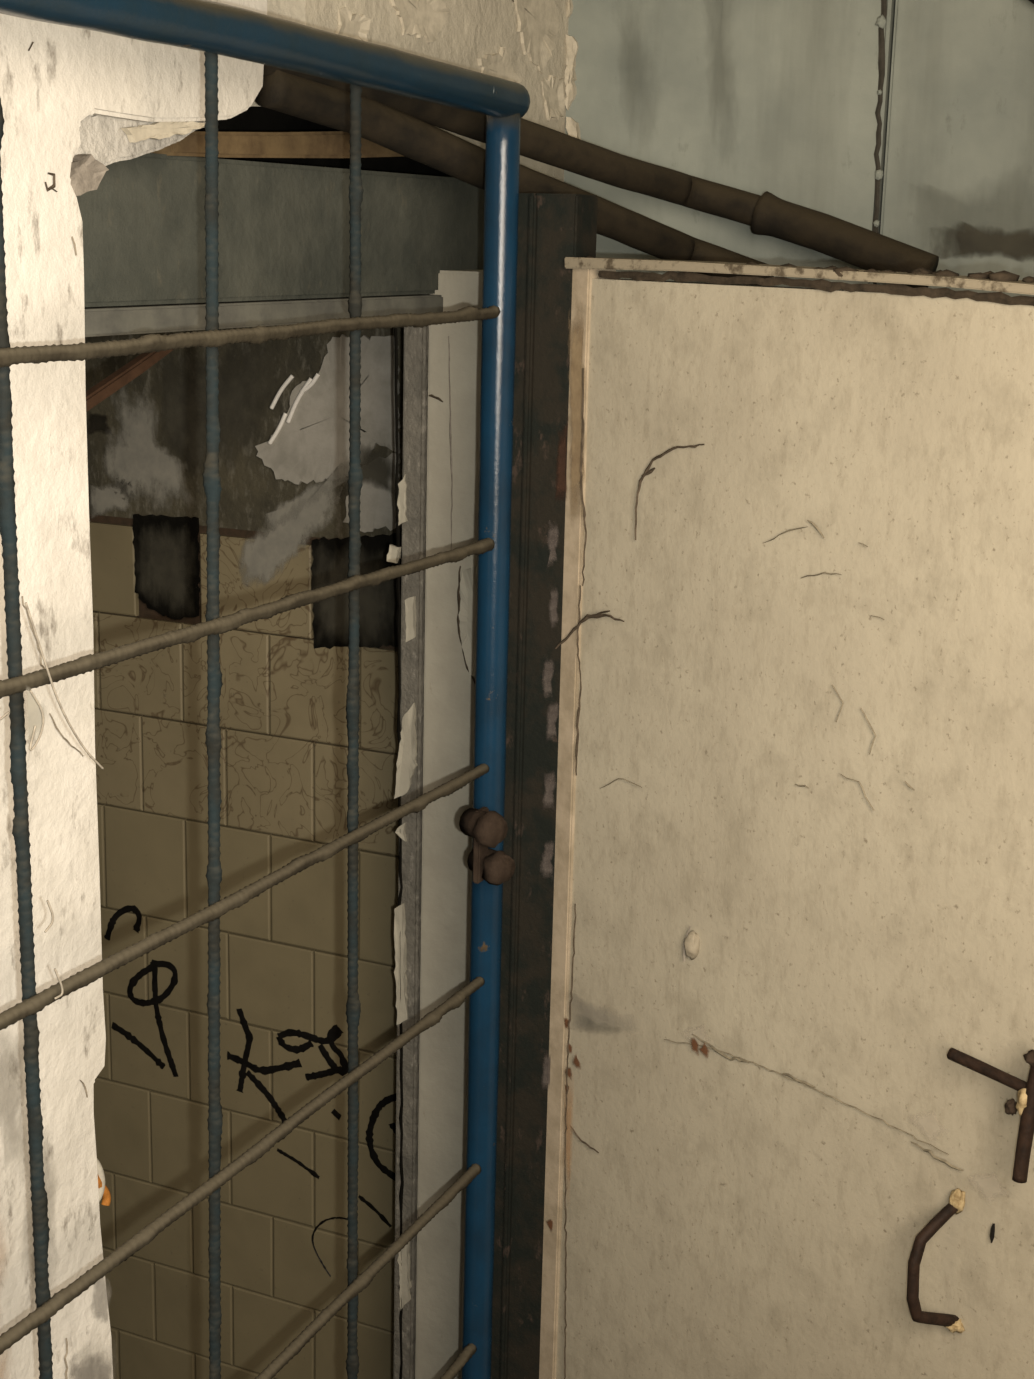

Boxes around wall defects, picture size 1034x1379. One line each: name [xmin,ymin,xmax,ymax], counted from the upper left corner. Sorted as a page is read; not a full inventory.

flaking render [45,115,205,196]
damp [944,223,1034,260]
peeling [88,334,416,649]
peeling [394,703,418,799]
peeling [395,823,407,842]
peeling [394,903,408,1025]
peeling [397,1241,412,1311]